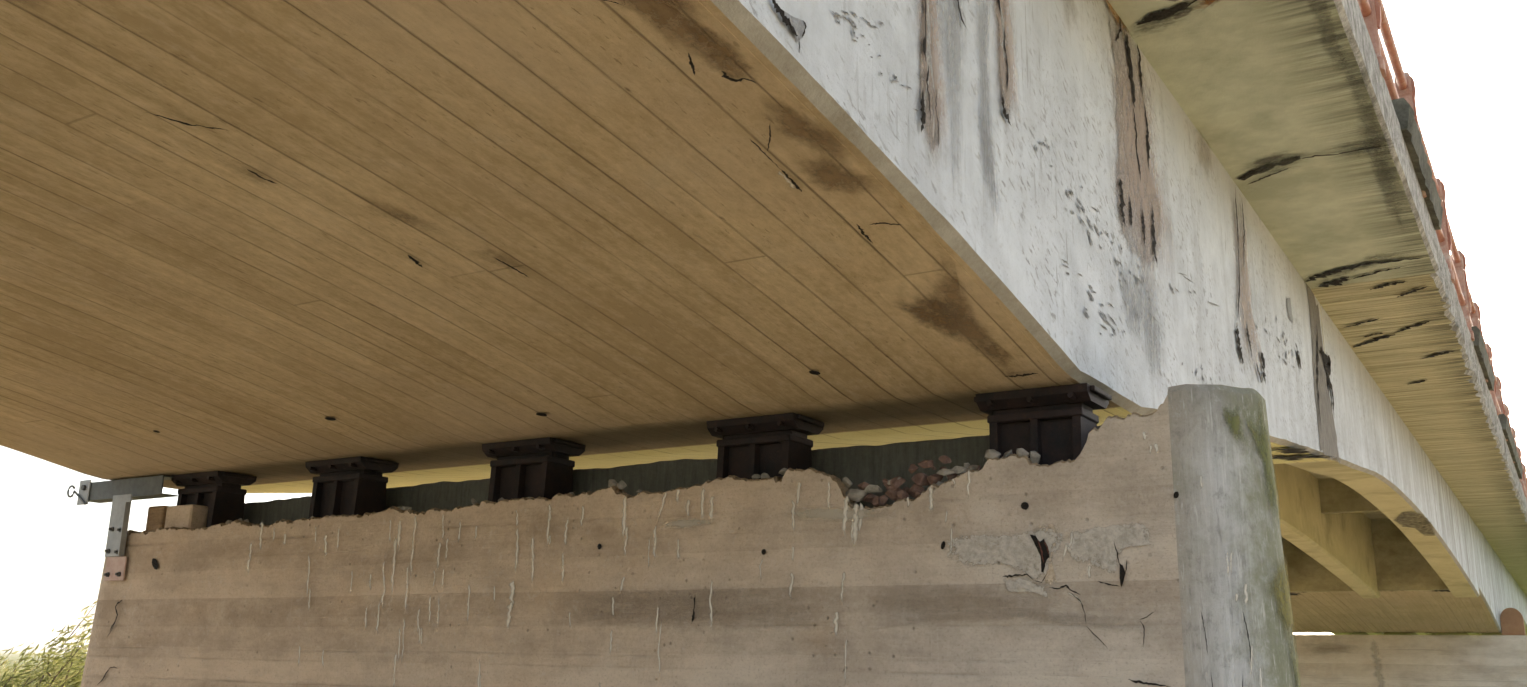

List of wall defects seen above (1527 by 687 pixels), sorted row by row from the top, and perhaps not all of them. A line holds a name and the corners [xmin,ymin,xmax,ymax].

damp [627,0,747,75]
damp [776,108,865,192]
damp [908,277,1008,362]
spalling [842,448,1041,507]
damp [350,515,477,685]
damp [494,505,584,625]
damp [789,482,868,597]
spalling [947,523,1151,597]
crack [1050,543,1127,648]
crack [1128,612,1171,687]
crack [1201,612,1251,687]